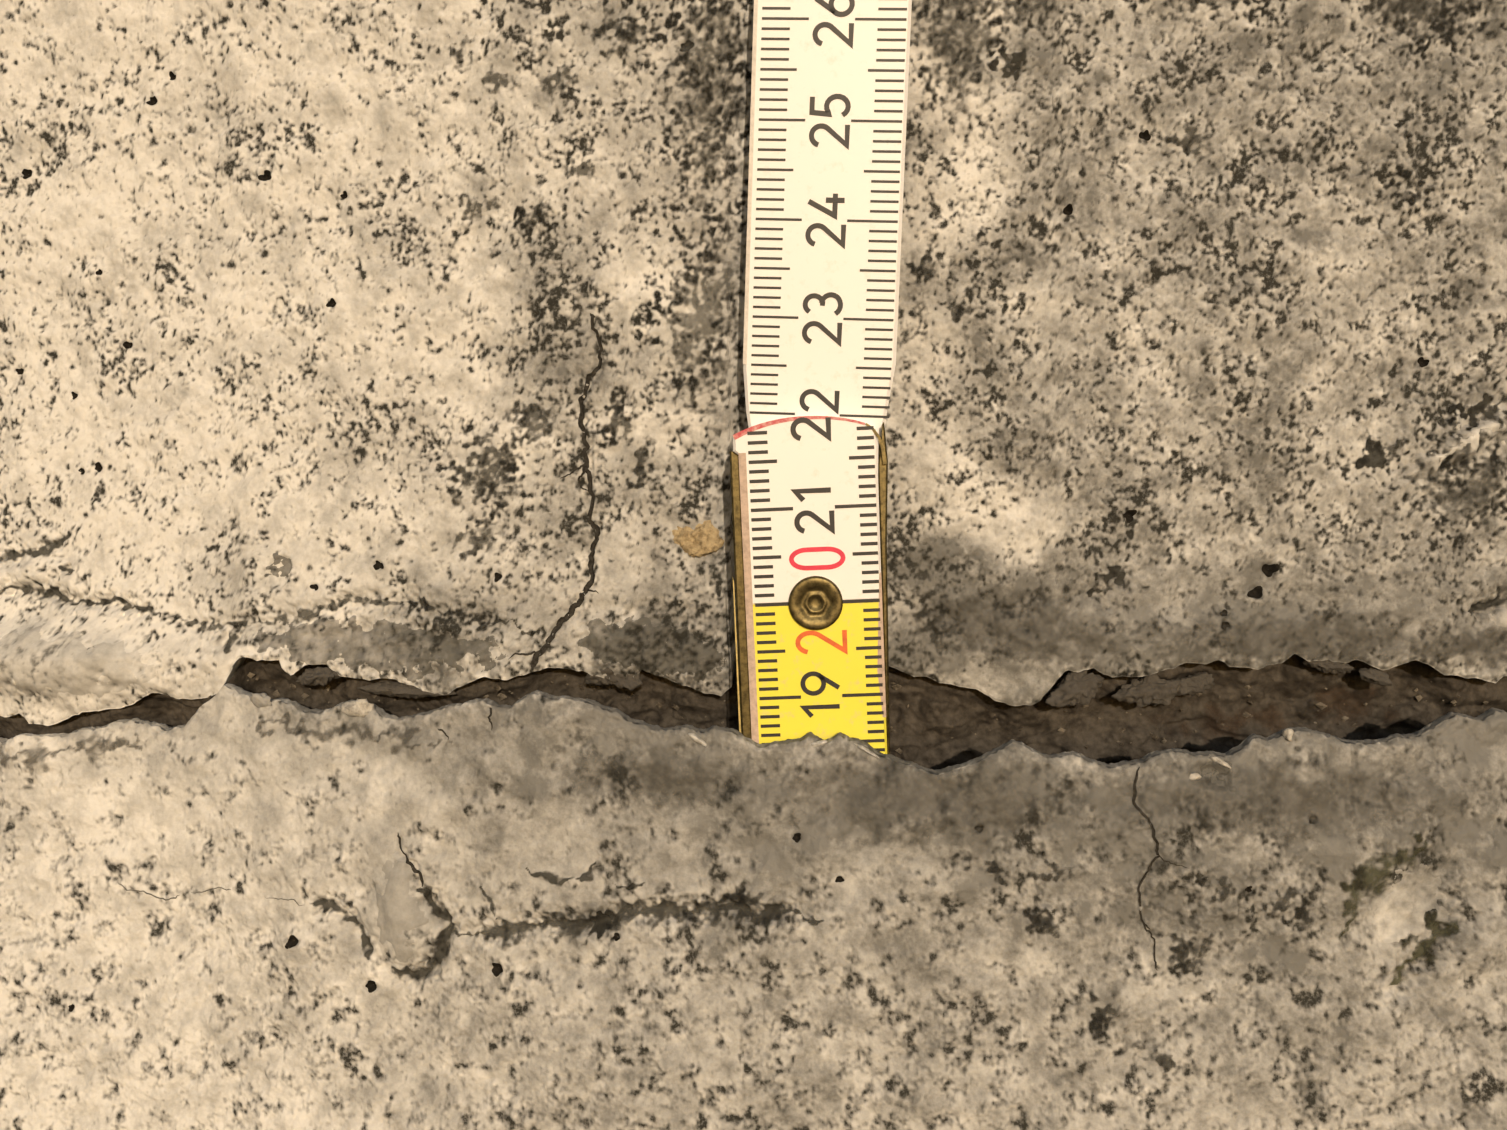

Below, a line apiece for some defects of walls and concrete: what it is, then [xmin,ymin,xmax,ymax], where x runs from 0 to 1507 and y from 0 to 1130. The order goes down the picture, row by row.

crack [0,313,741,739]
crack [889,654,1507,971]